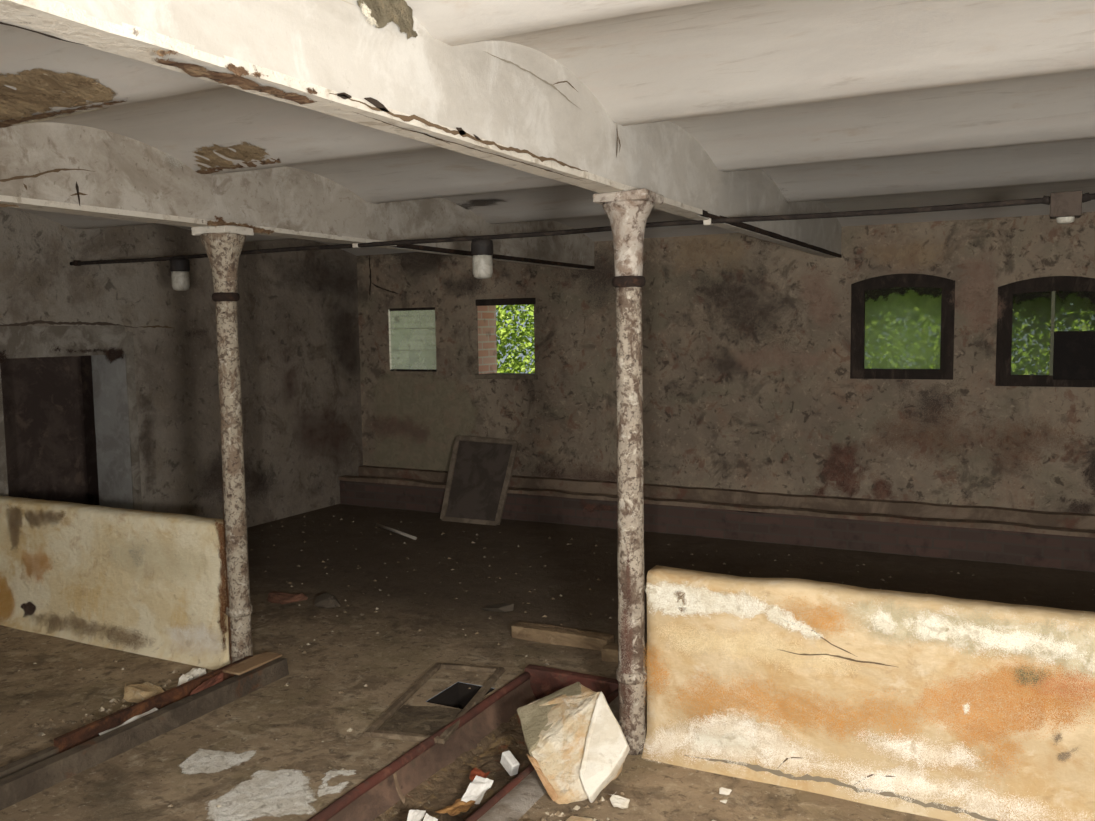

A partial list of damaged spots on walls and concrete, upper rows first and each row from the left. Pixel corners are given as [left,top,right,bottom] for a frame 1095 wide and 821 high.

flaking render [357,0,418,39]
flaking render [0,68,127,128]
flaking render [152,48,321,104]
flaking render [193,142,281,174]
damp [20,507,66,529]
damp [0,576,226,662]
damp [778,596,856,644]
crack [766,613,896,667]
damp [641,643,1095,821]
crack [684,755,998,821]